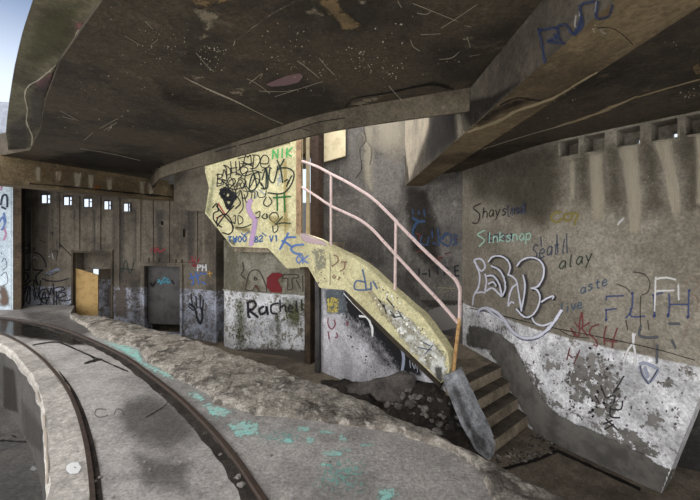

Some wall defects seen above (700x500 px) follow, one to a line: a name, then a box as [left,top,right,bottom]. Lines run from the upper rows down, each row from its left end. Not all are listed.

crack [356,126,372,178]
damp [236,299,305,359]
spalling [70,281,564,500]
peeling [423,301,683,493]